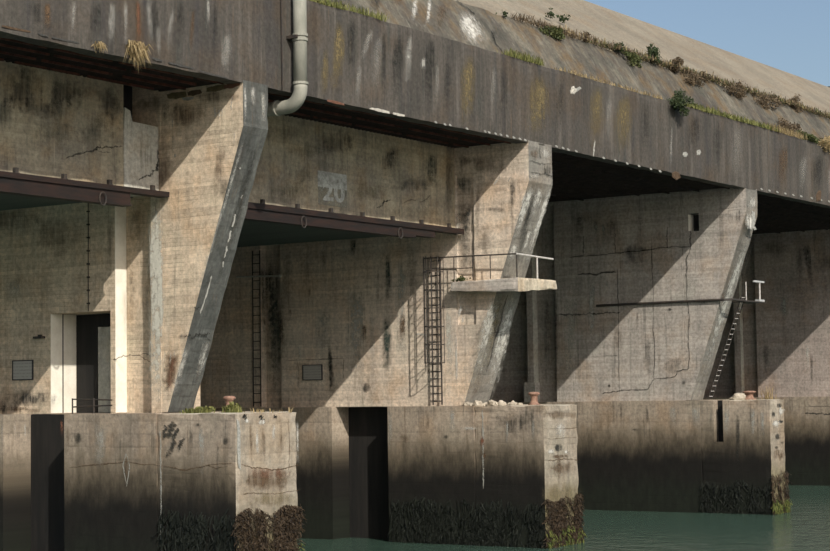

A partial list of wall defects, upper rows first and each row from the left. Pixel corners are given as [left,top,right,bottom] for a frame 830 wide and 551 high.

crack [67,146,121,158]
crack [139,150,159,180]
crack [558,227,692,394]
crack [113,353,154,363]
rust [164,350,176,386]
water stain [383,322,391,359]
crack [70,433,298,508]